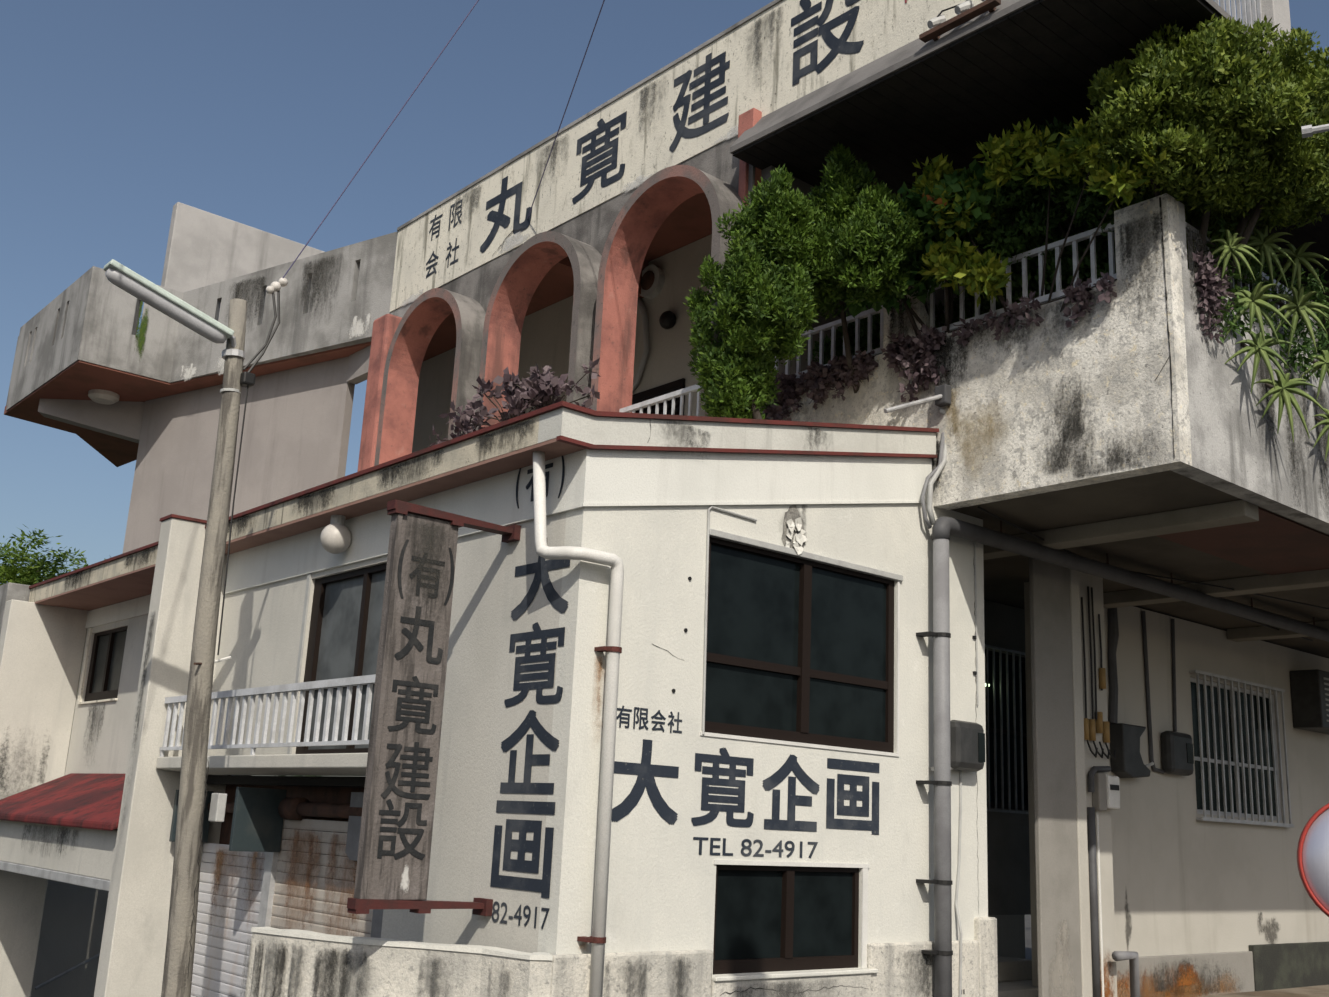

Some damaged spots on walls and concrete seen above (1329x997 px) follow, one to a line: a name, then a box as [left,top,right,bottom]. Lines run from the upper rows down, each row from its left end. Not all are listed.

water stain [235,277,265,313]
water stain [302,257,335,308]
water stain [1043,399,1147,476]
water stain [244,943,367,997]
rust [1101,963,1207,997]